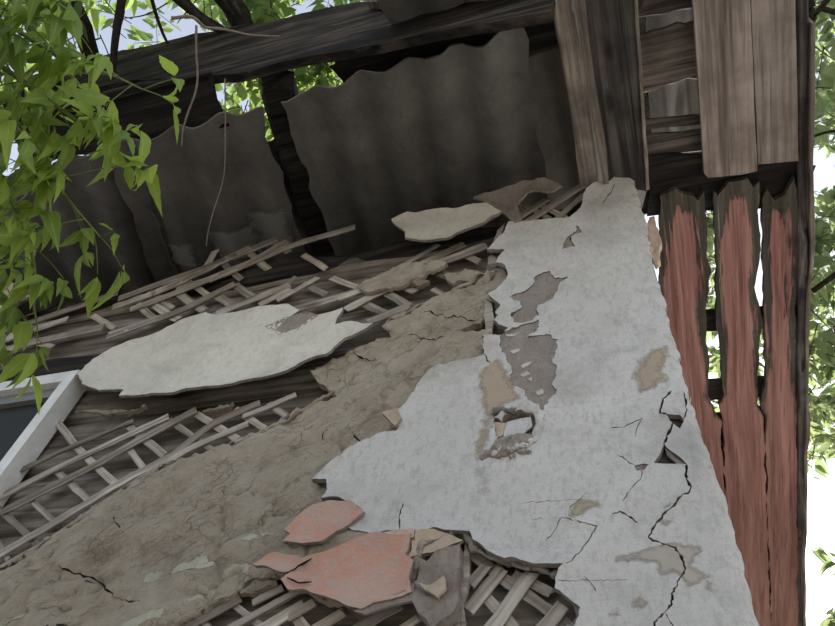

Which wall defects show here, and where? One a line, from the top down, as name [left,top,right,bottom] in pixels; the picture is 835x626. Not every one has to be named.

flaking render [391,177,562,242]
crack [409,310,488,362]
spalling [0,260,565,626]
crack [659,394,687,443]
crack [58,565,140,603]
crack [654,549,686,626]